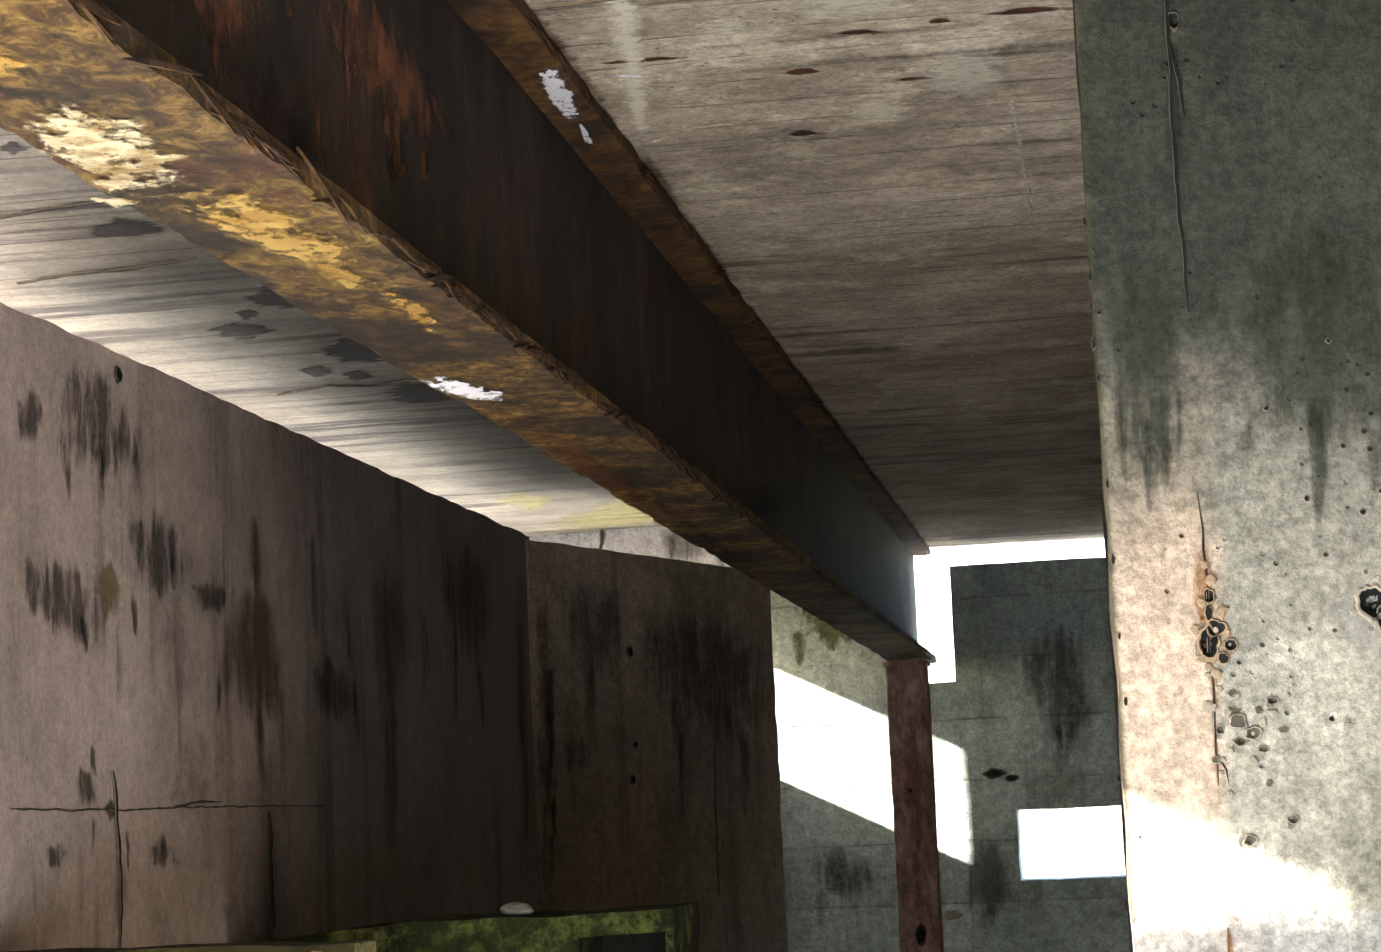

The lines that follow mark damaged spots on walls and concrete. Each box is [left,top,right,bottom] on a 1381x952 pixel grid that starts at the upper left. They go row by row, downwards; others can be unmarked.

corrosion [236,61,311,159]
damp [20,395,42,437]
damp [67,378,138,499]
damp [1310,409,1325,512]
damp [26,562,97,649]
corrosion [101,564,118,614]
damp [136,514,184,596]
spalling [1349,575,1381,633]
spalling [1191,561,1291,798]
crack [11,771,323,948]
spalling [1242,833,1259,848]
spalling [1286,814,1301,825]